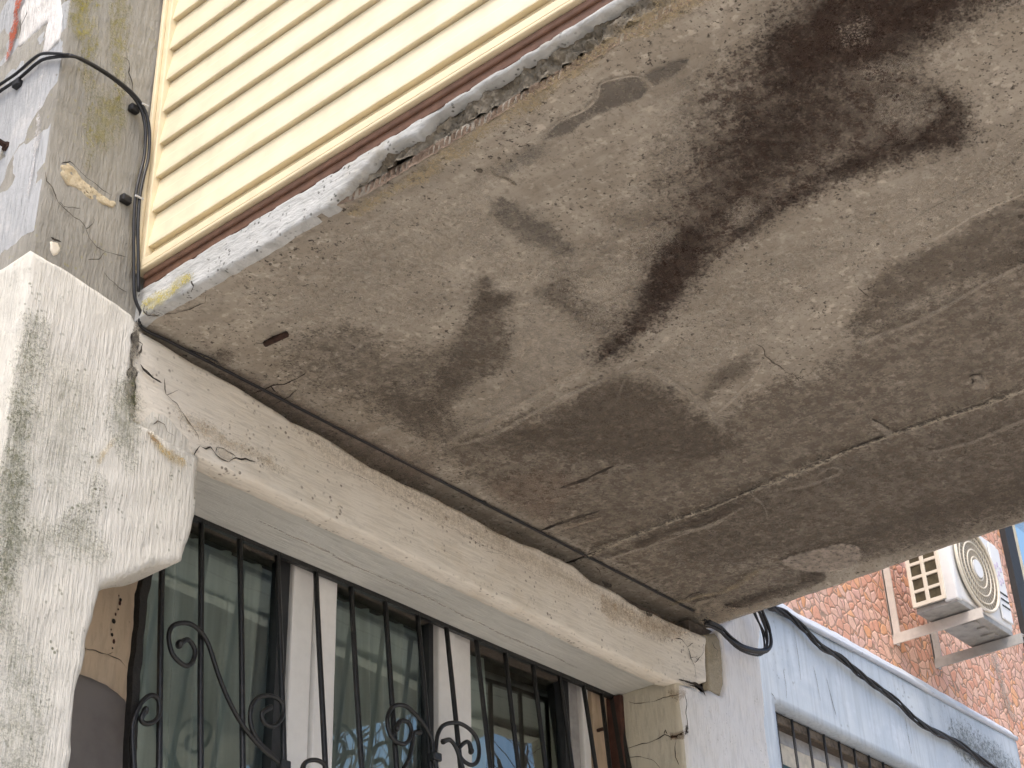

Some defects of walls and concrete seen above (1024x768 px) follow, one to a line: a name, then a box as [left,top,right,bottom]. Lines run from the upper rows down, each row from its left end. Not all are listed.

peeling [18,0,63,52]
spalling [50,237,61,256]
spalling [60,161,116,208]
crack [45,172,255,462]
spalling [337,0,703,217]
water stain [281,0,1024,628]
crack [566,389,1024,575]
crack [630,638,705,765]